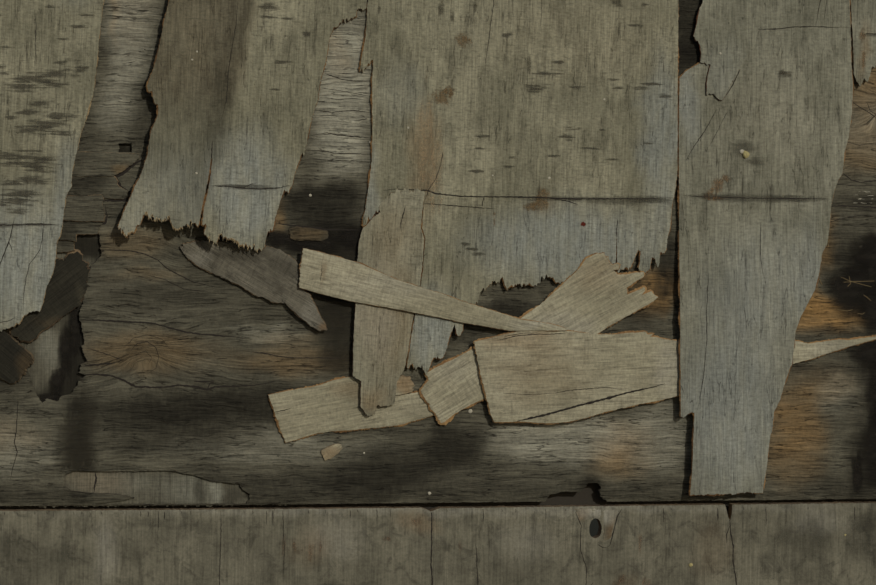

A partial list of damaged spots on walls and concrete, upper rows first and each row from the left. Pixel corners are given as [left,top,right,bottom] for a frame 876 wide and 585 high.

spalling [57,151,140,253]
peeling [288,226,329,242]
crack [389,153,657,235]
crack [683,173,876,222]
damp [828,235,876,492]
crack [703,507,744,585]